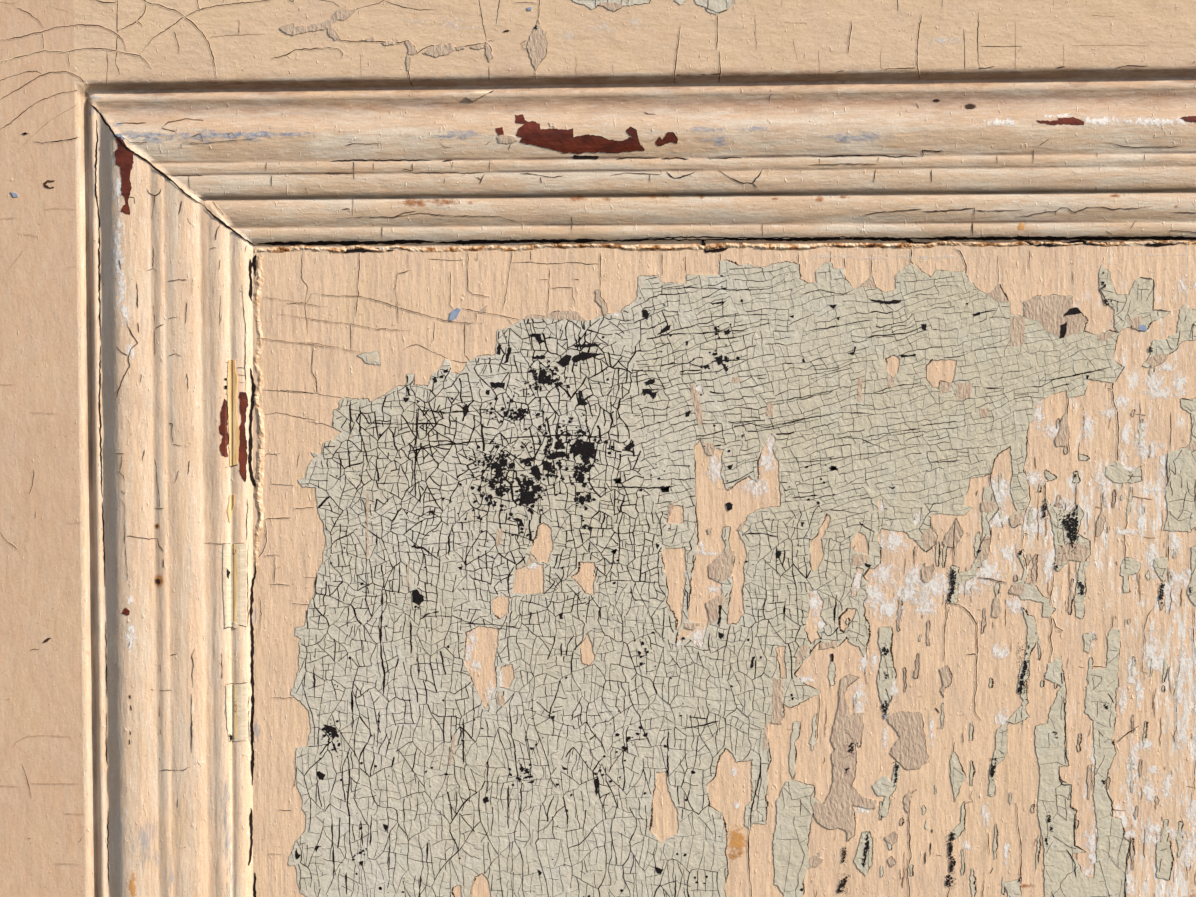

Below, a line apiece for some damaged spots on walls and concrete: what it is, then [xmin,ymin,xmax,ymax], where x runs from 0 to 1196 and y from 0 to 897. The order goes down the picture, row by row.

crack [271,0,541,87]
peeling [496,114,678,159]
crack [963,12,1150,69]
peeling [1036,113,1196,126]
peeling [112,122,309,327]
crack [91,105,1196,831]
peeling [219,240,1196,628]
peeling [763,265,1196,897]
peeling [585,710,648,795]
crack [707,739,772,897]
crack [900,790,942,897]
crack [1059,701,1196,897]